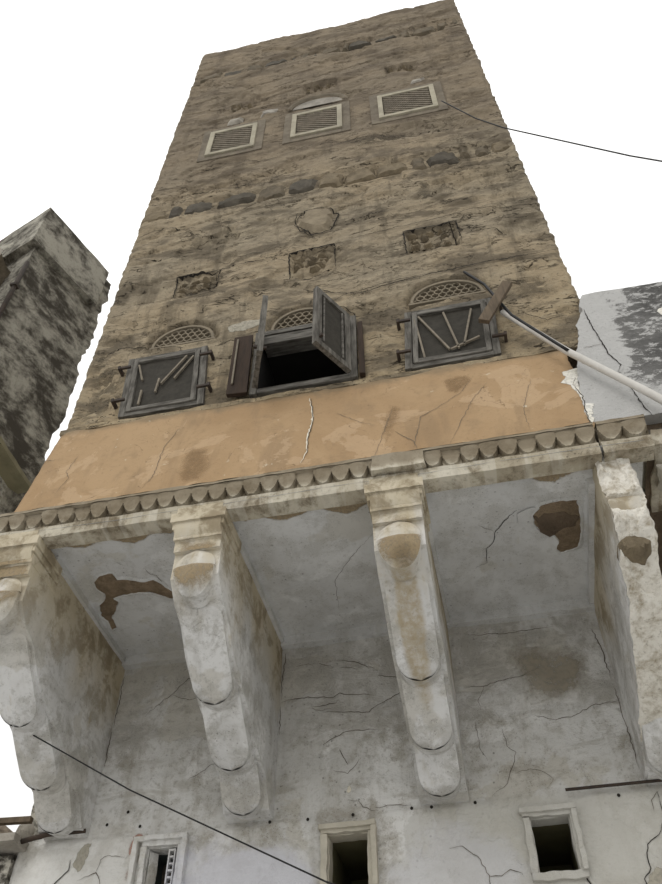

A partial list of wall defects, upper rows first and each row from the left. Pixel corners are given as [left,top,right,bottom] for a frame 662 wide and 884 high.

crack [301,399,314,461]
crack [340,383,483,454]
crack [476,510,517,568]
spalling [517,496,584,554]
spalling [90,571,174,632]
crack [279,654,400,774]
crack [535,631,639,767]
crack [501,730,554,789]
peeling [73,844,91,872]
crack [52,855,120,884]
crack [453,846,523,882]
crack [644,791,662,884]